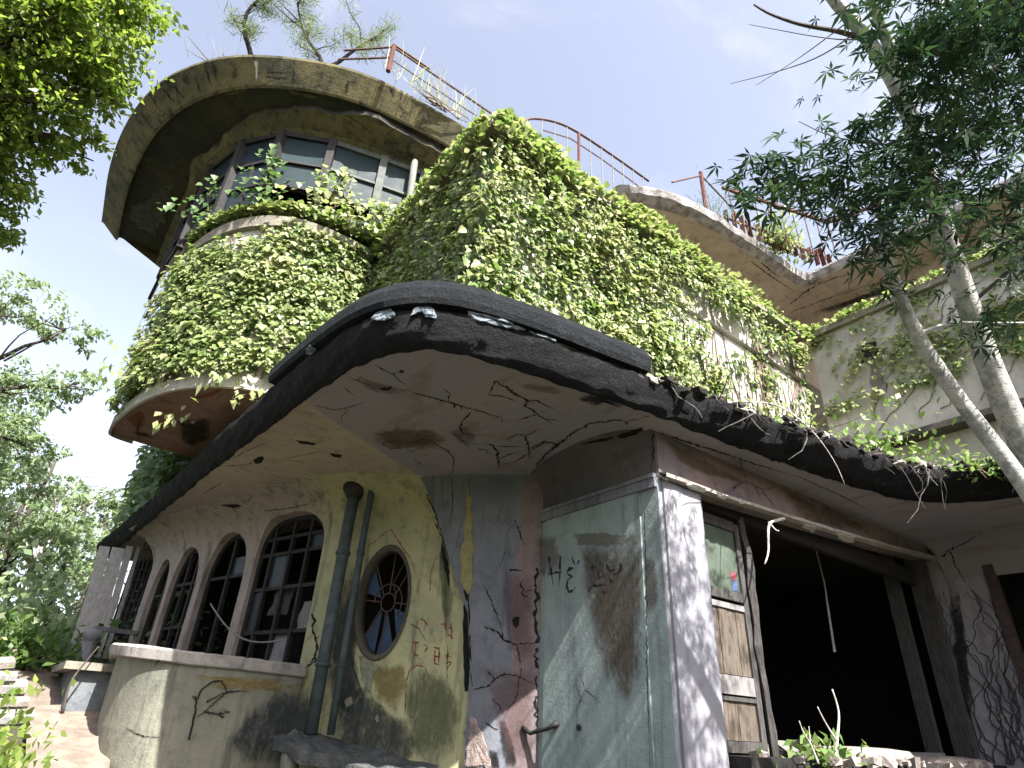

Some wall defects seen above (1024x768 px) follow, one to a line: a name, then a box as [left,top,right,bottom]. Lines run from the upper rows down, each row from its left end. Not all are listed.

water stain [180,419,208,445]
crack [204,440,331,511]
water stain [379,430,441,448]
crack [318,366,864,560]
water stain [440,534,450,619]
flaking render [441,487,475,691]
water stain [575,533,641,693]
water stain [331,580,457,758]
spalling [463,716,492,768]